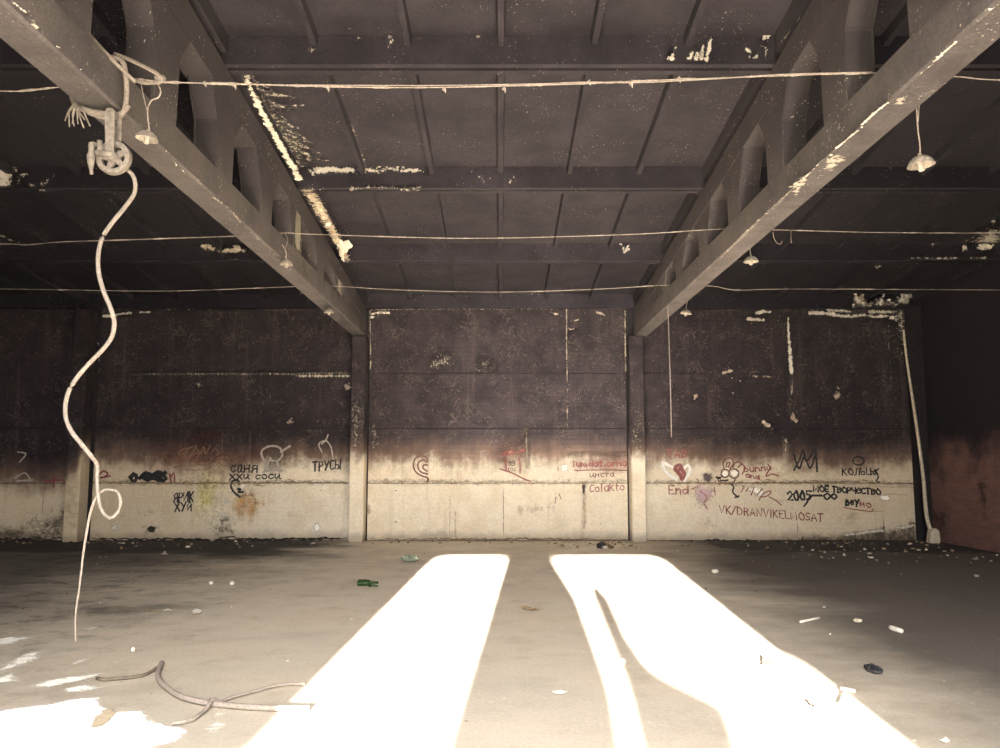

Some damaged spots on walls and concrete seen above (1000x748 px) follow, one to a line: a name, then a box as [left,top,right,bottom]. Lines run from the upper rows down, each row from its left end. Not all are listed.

leakage [244,75,424,181]
peeling [741,96,906,236]
flaking render [808,309,897,320]